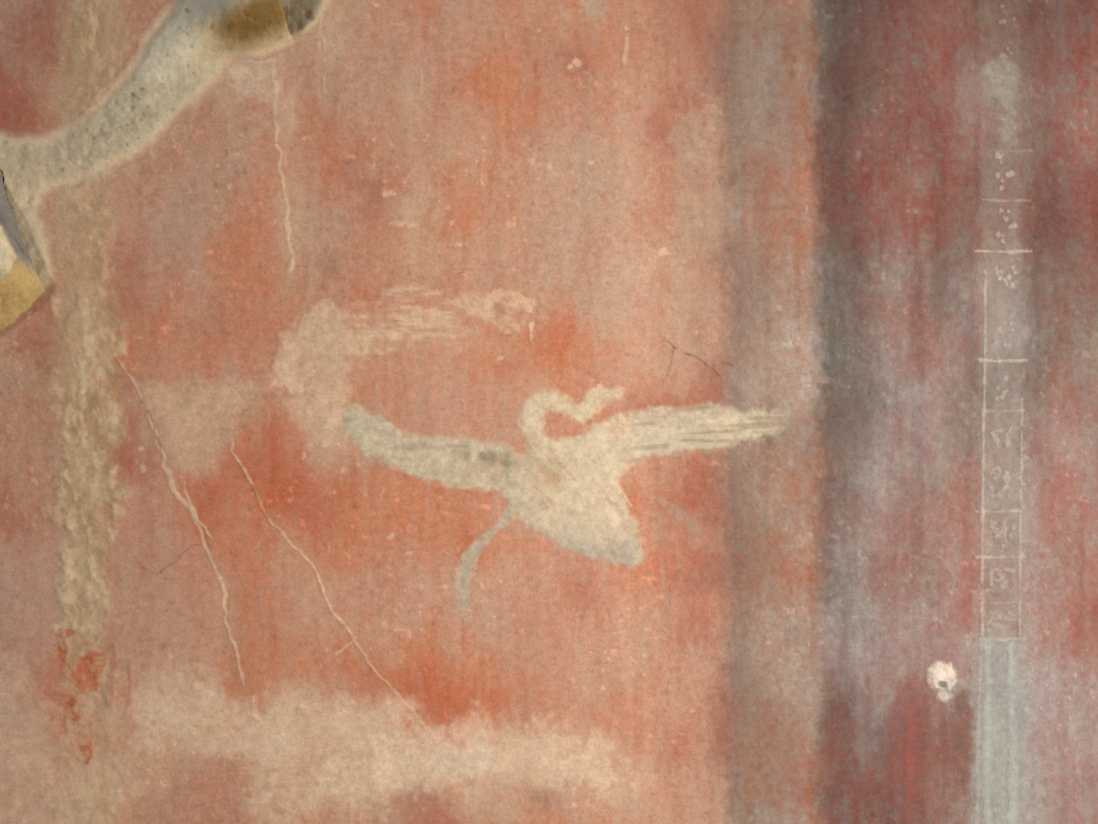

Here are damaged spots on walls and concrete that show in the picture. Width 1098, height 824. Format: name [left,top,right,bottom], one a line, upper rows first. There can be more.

crack [271,105,296,275]
crack [113,352,246,688]
crack [229,445,398,691]
peeling [0,626,108,824]
peeling [935,679,955,704]